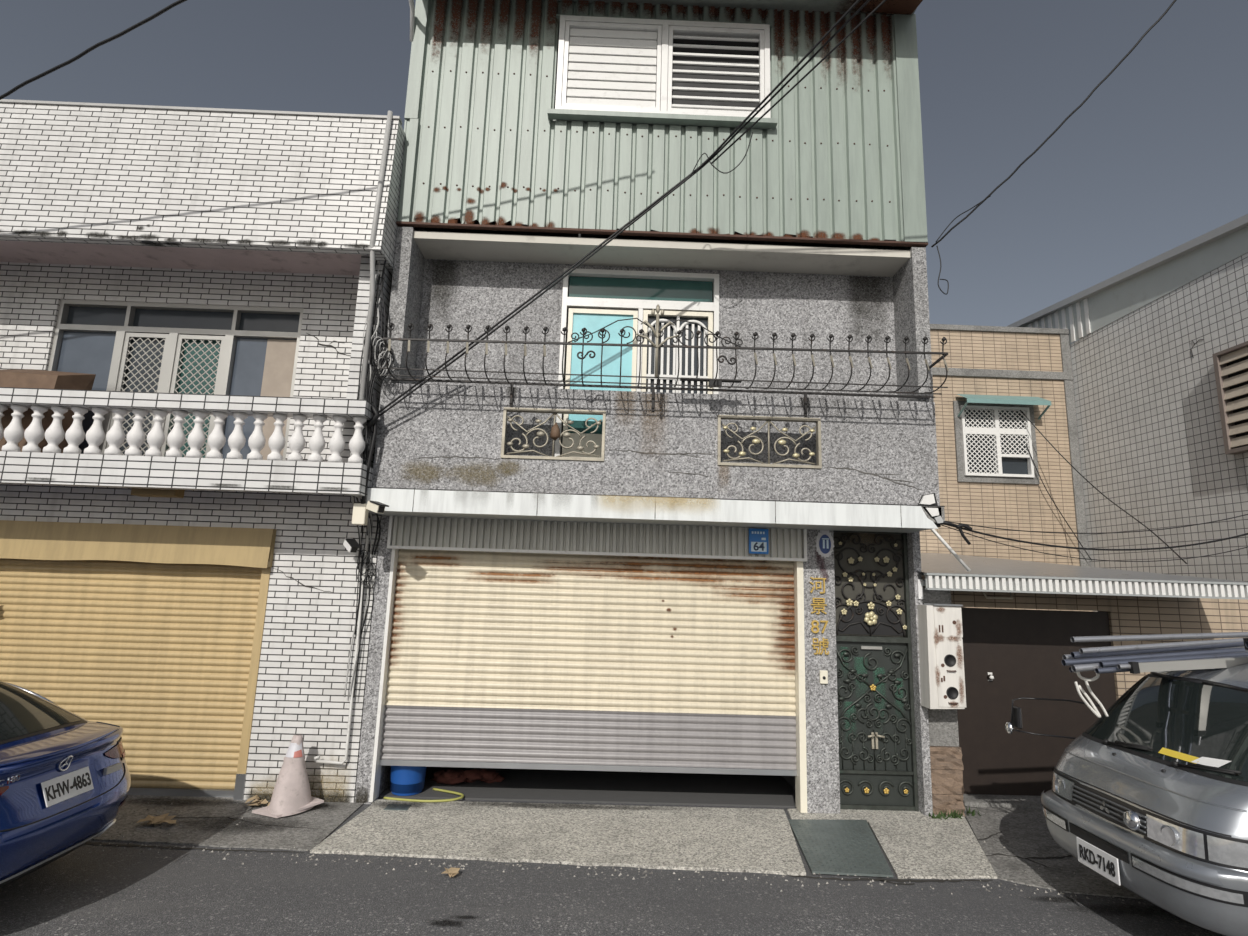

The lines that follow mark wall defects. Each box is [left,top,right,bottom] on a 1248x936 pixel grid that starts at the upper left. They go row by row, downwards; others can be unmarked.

rust [433,0,923,73]
rust [415,182,558,227]
rust [389,556,457,658]
rust [480,557,795,669]